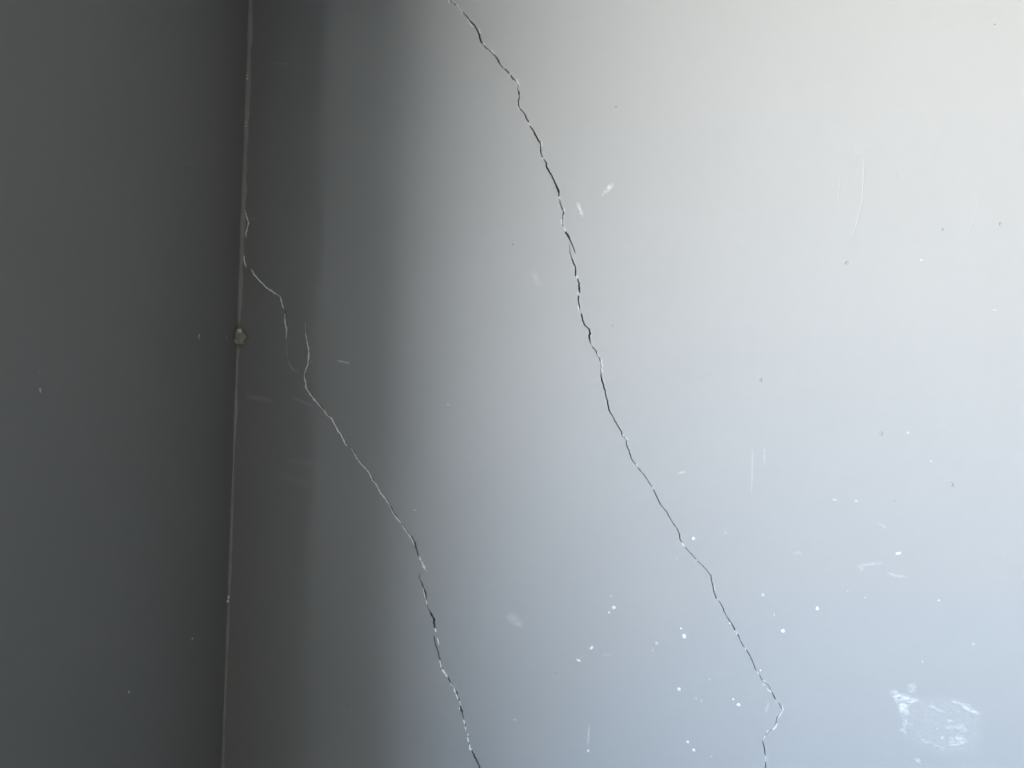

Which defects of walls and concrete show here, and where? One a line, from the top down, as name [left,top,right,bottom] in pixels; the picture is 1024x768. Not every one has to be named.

crack [243,211,480,768]
crack [448,0,784,768]